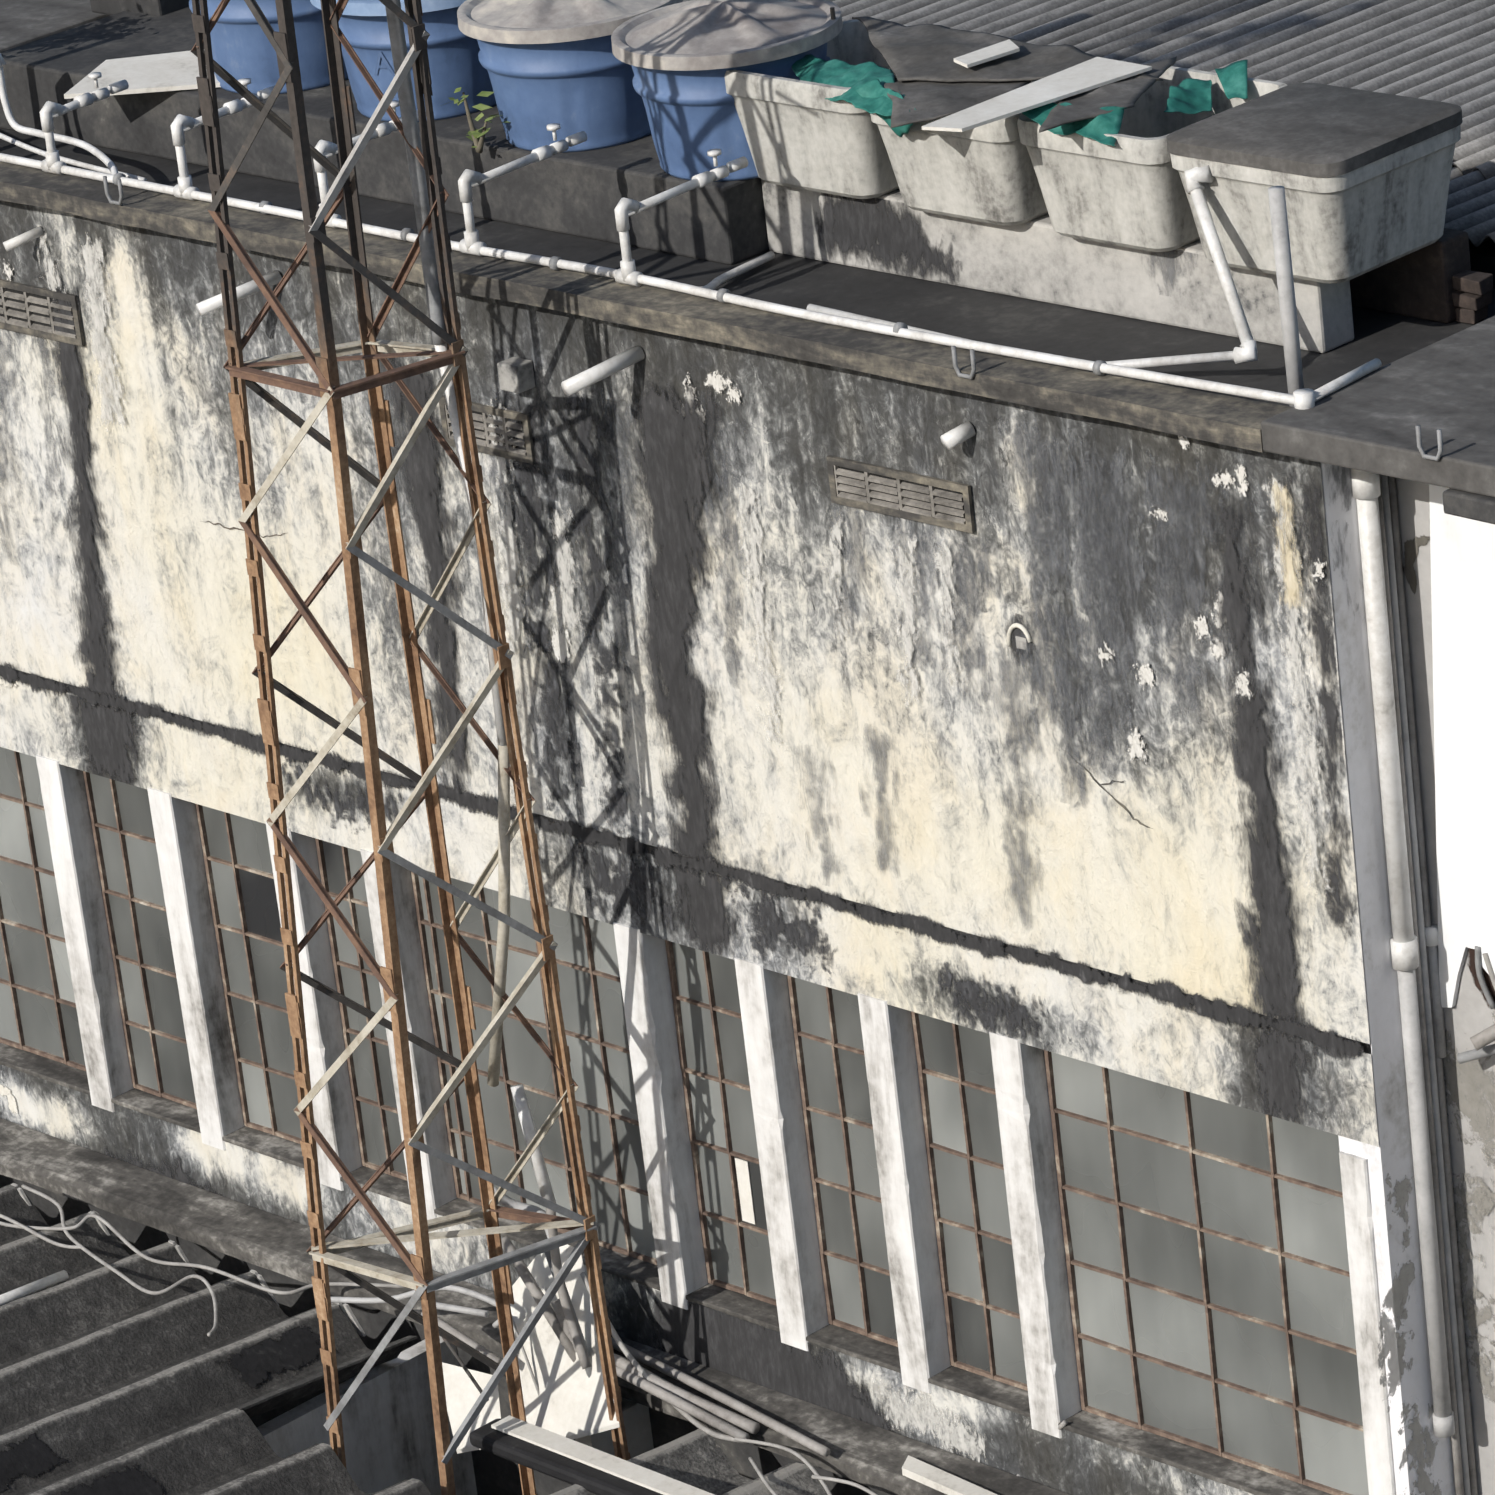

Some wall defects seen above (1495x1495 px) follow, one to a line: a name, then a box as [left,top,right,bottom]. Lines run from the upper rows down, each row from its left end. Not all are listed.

leakage [816,193,958,283]
leakage [1151,250,1192,286]
leakage [0,234,417,832]
leakage [384,353,1364,1125]
spalling [1468,946,1495,1018]
leakage [104,1144,221,1196]
peeling [1442,1030,1495,1402]